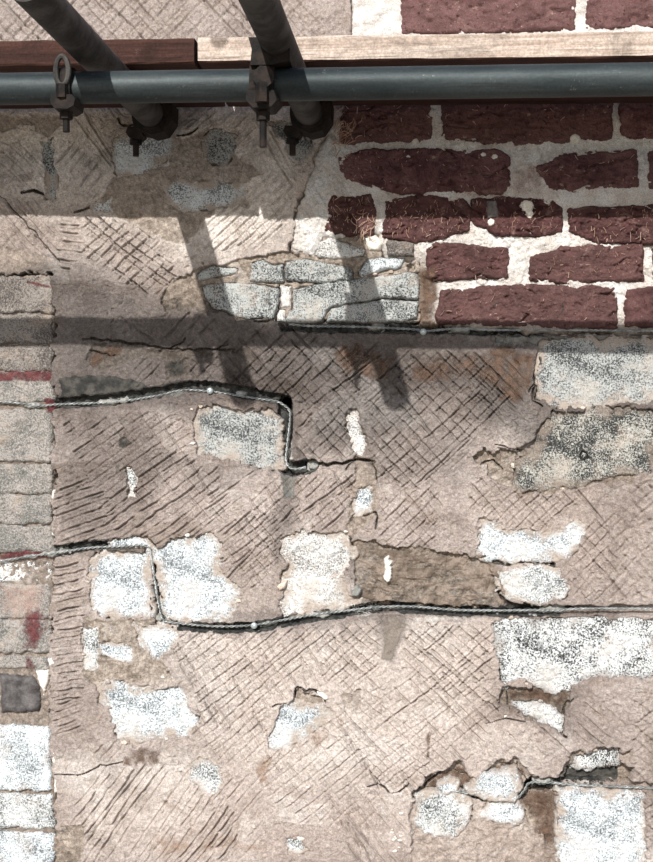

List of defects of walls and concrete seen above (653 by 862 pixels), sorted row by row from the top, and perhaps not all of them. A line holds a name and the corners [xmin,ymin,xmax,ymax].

spalling [111,133,180,178]
spalling [197,235,420,325]
spalling [190,404,290,471]
crack [303,458,378,481]
spalling [510,333,653,493]
spalling [80,532,241,747]
spalling [279,529,363,617]
crack [497,591,574,608]
spalling [474,518,653,733]
crack [367,769,463,793]
spalling [413,763,526,841]
spalling [550,747,647,862]